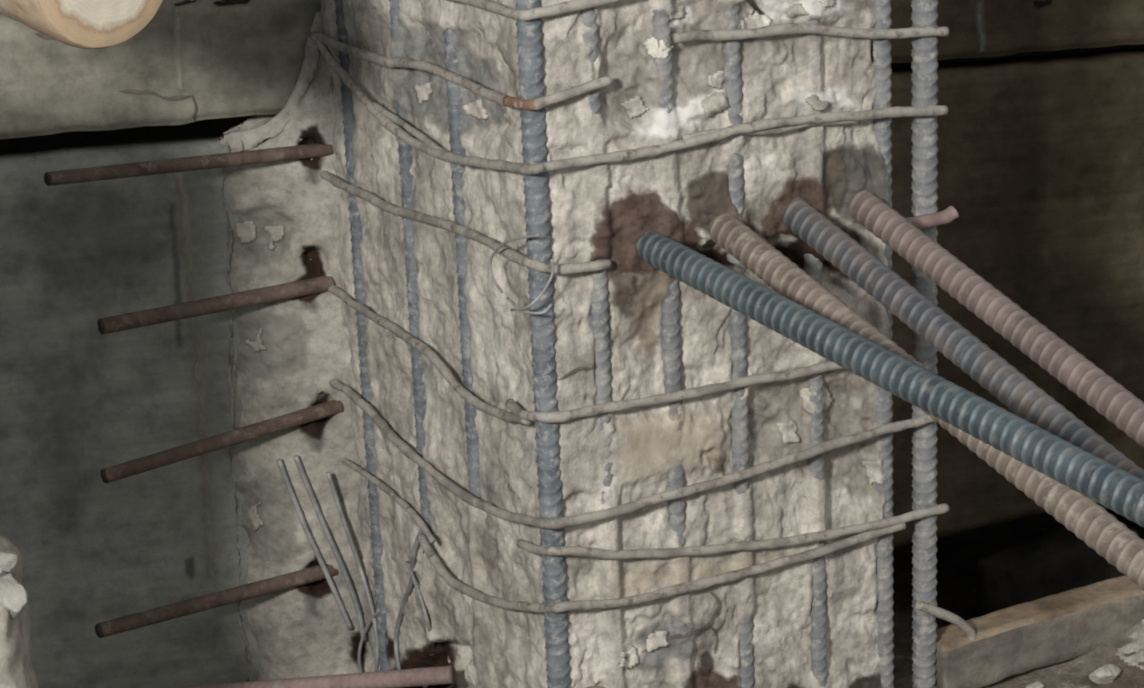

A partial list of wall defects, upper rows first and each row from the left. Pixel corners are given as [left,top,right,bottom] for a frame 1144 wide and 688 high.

crack [174,0,250,8]
corrosion [44,143,334,186]
spalling [388,0,507,557]
spalling [515,0,571,688]
spalling [590,259,613,504]
spalling [660,276,686,546]
spalling [590,0,892,208]
corrosion [761,178,861,279]
corrosion [95,564,339,638]
corrosion [175,632,456,688]
corrosion [685,650,738,688]
spalling [875,533,894,688]